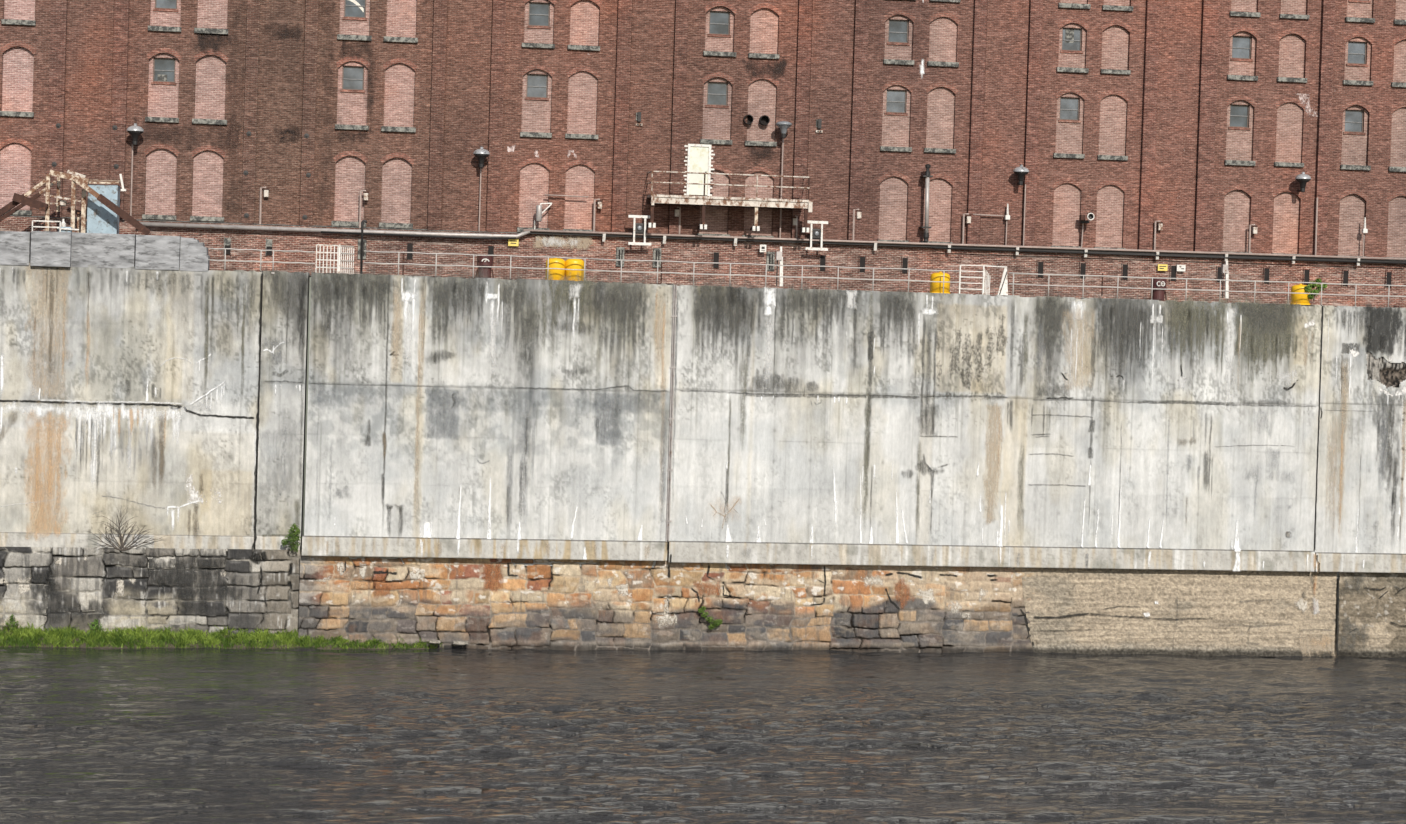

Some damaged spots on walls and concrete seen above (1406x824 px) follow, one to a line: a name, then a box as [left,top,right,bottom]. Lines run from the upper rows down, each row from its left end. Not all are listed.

damp [287,279,416,373]
damp [1012,316,1028,381]
damp [1069,301,1288,411]
spalling [1342,344,1406,388]
damp [1368,327,1406,361]
damp [0,355,182,479]
damp [167,475,222,532]
damp [1378,386,1406,540]